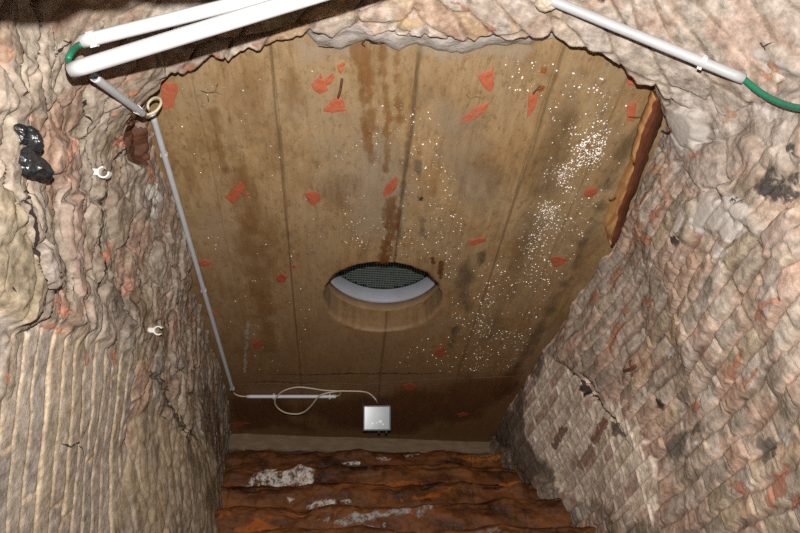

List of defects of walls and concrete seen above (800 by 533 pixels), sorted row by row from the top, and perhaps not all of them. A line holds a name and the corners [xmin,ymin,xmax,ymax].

spalling [311,62,346,94]
spalling [477,66,494,91]
spalling [323,97,346,113]
spalling [459,102,489,124]
rust [380,199,401,262]
crack [150,370,198,446]
crack [567,350,633,451]